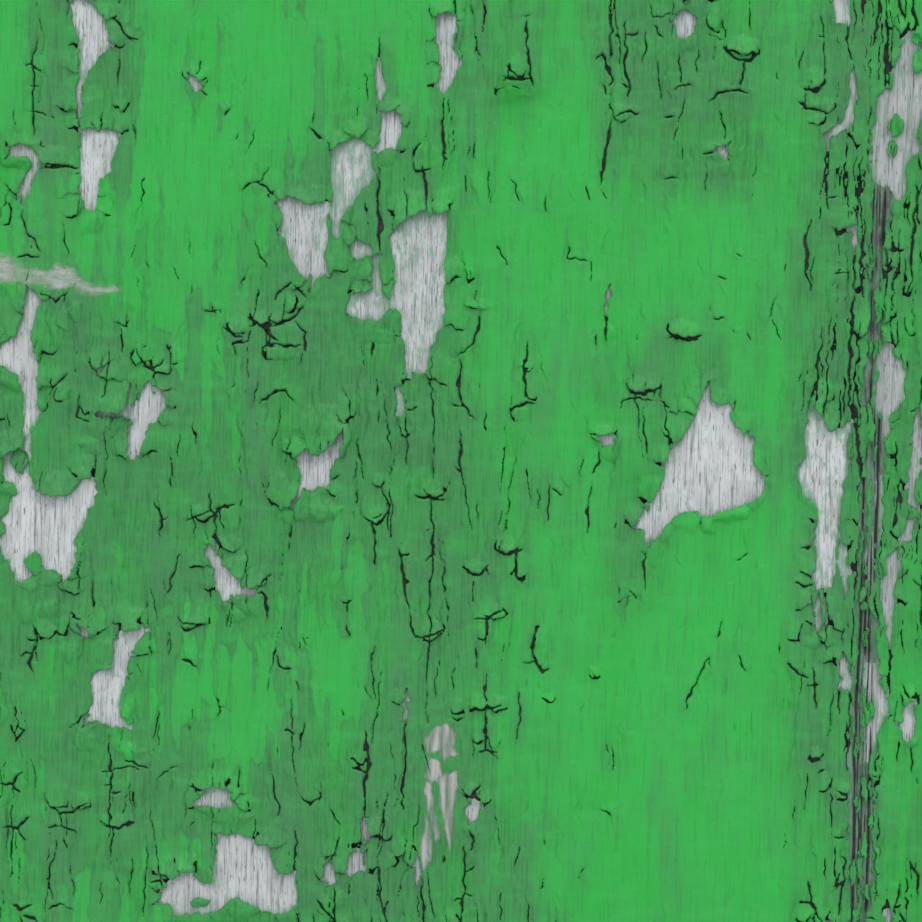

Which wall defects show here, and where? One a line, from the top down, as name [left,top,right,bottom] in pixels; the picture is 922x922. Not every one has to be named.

peeling [0,0,146,265]
peeling [251,0,497,480]
crack [460,133,555,219]
crack [581,0,645,208]
peeling [0,279,186,870]
crack [337,594,382,708]
peeling [615,375,769,596]
crack [679,615,750,717]
peeling [787,0,922,922]
crack [0,768,79,922]
peeling [146,686,491,922]
crack [829,695,886,922]